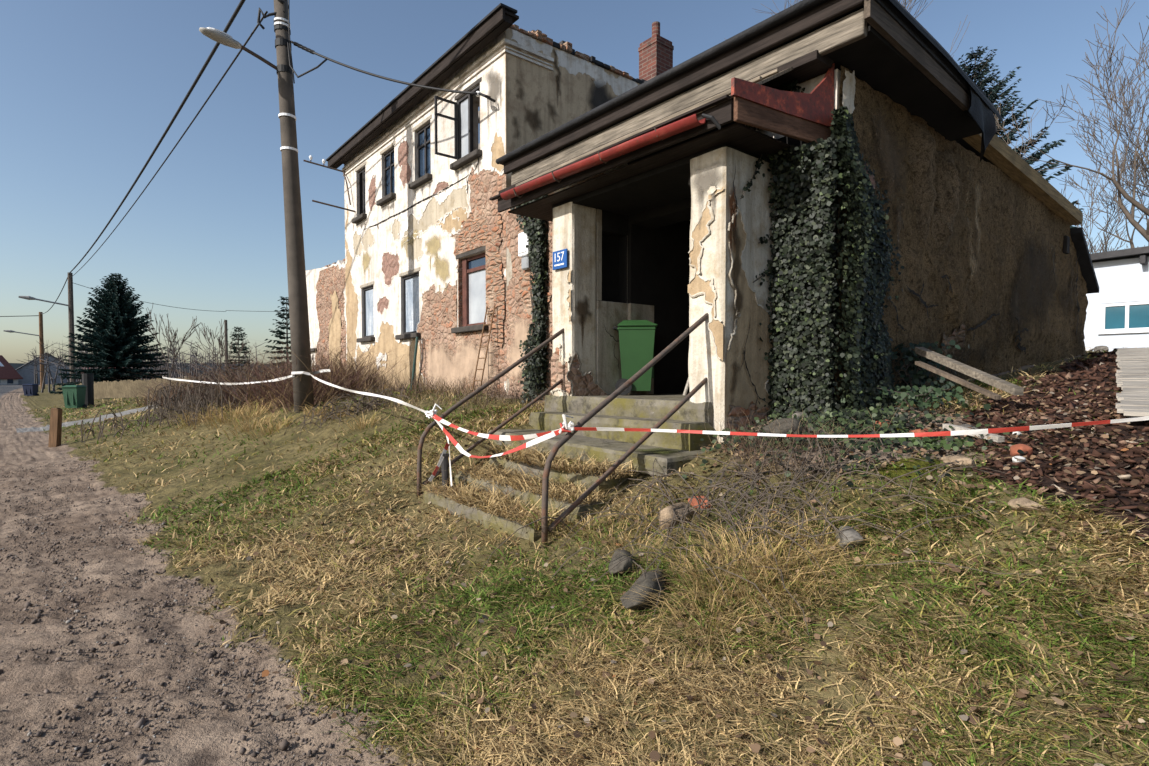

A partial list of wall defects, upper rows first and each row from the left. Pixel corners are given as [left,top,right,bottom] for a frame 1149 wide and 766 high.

water stain [515,106,555,136]
peeling [315,130,608,396]
peeling [688,186,776,437]
crack [740,319,769,403]